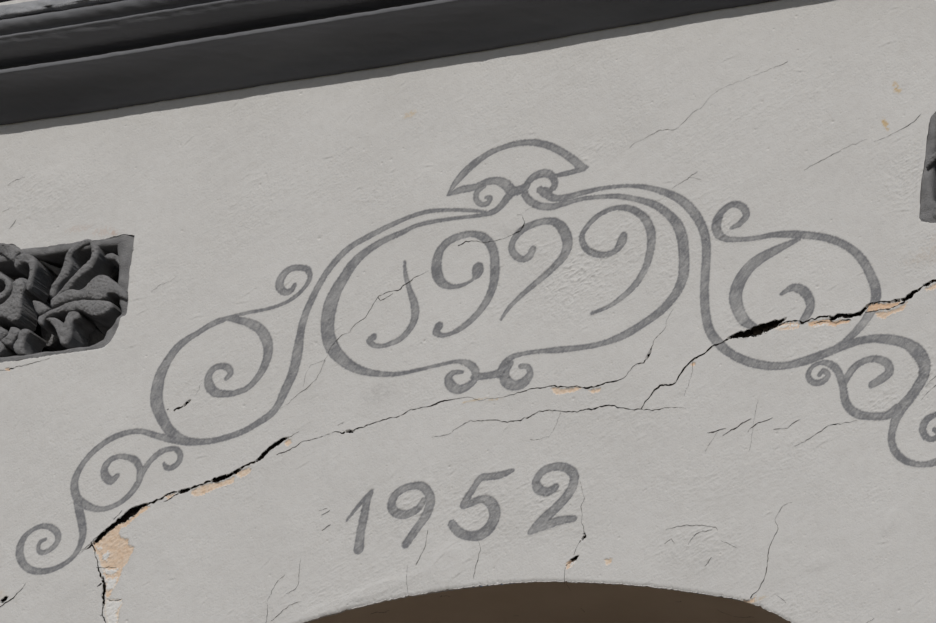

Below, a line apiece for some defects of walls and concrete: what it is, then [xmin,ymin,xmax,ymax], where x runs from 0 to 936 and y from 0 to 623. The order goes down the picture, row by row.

flaking render [774,318,850,331]
flaking render [865,301,908,320]
crack [82,274,936,623]
flaking render [189,466,252,497]
flaking render [92,505,150,623]